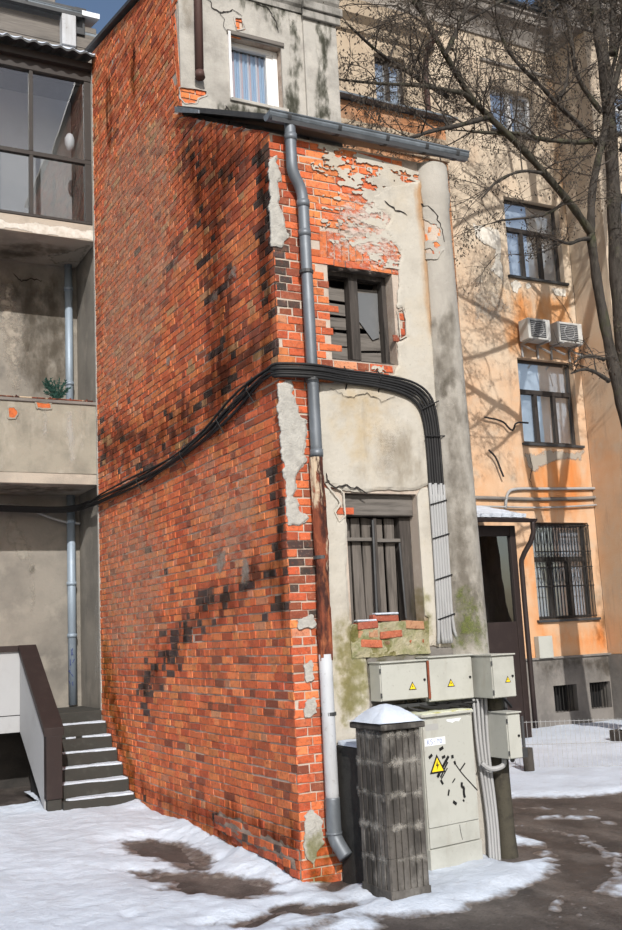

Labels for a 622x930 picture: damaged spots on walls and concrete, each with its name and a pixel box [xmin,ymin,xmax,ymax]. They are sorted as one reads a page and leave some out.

flaking render [269,135,286,168]
flaking render [273,184,306,363]
flaking render [296,140,419,375]